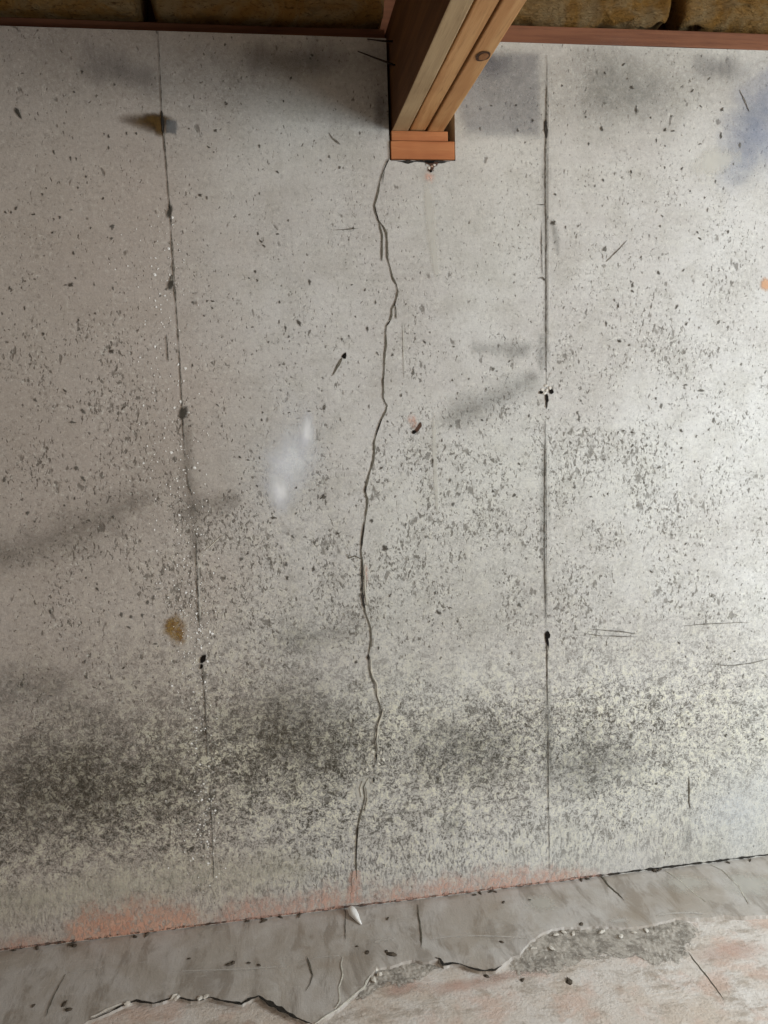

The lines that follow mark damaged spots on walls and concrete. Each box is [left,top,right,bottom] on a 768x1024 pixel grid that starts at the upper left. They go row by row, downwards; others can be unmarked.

crack [347,159,399,885]
rust [166,618,183,640]
rust [67,909,198,942]
spalling [510,920,699,976]
spalling [356,963,440,1001]